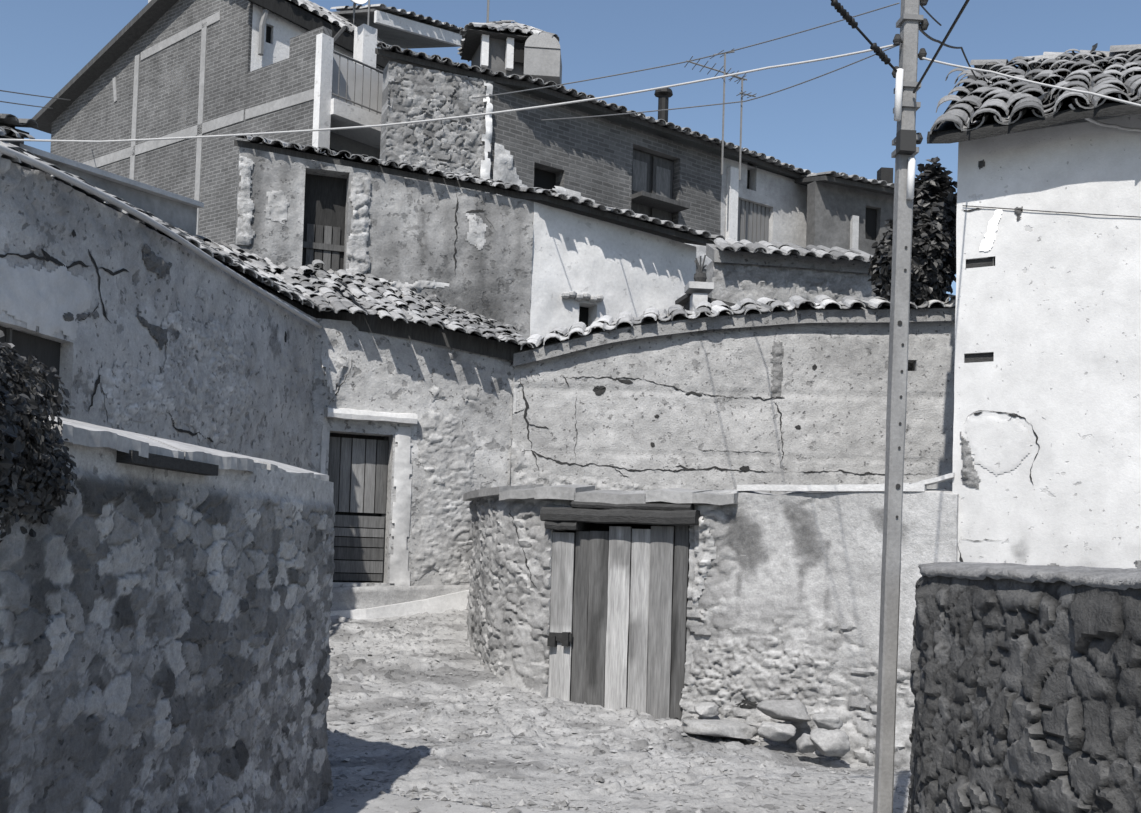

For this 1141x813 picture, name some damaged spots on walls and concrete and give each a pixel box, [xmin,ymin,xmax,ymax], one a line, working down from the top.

spalling [465,213,488,250]
spalling [387,280,449,292]
crack [512,376,921,481]
spalling [960,432,981,489]